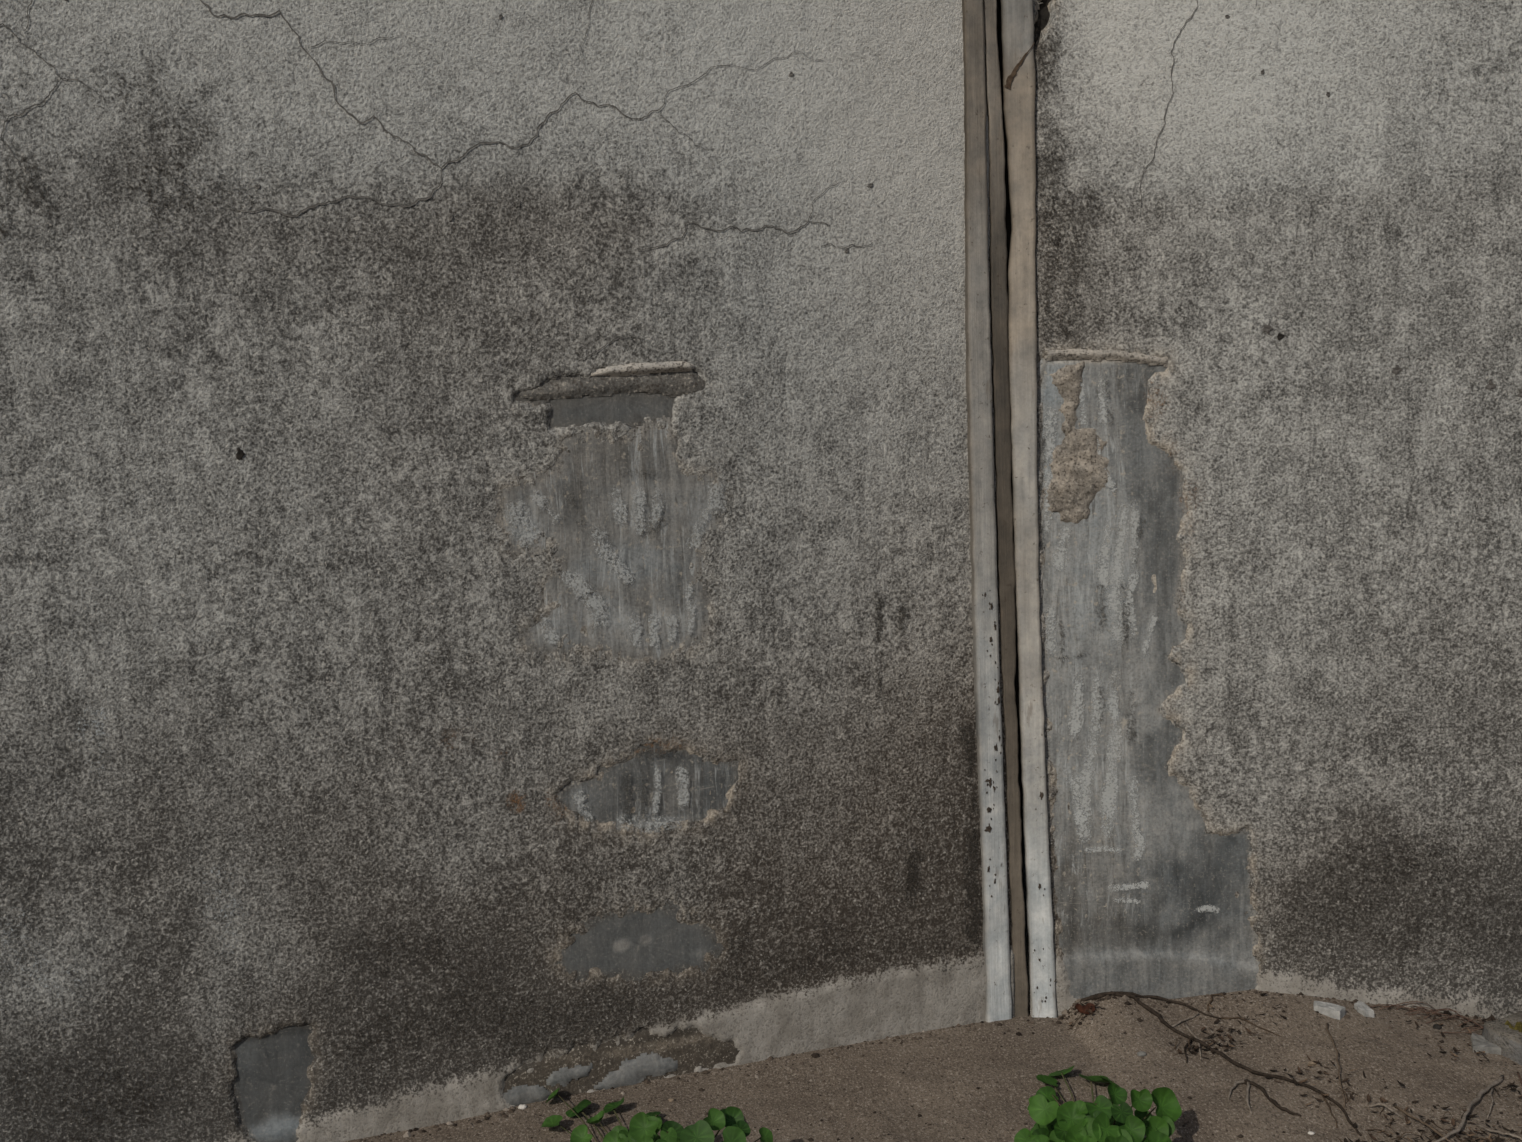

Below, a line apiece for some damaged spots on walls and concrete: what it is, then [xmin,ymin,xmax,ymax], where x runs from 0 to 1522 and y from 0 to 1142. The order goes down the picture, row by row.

crack [0,0,106,190]
crack [200,0,821,217]
crack [1004,0,1052,89]
crack [1139,1,1198,218]
crack [639,180,872,250]
spalling [514,361,705,429]
spalling [1042,361,1110,524]
spalling [555,744,740,832]
damp [1285,829,1522,969]
damp [334,926,633,1078]
damp [4,1045,183,1142]